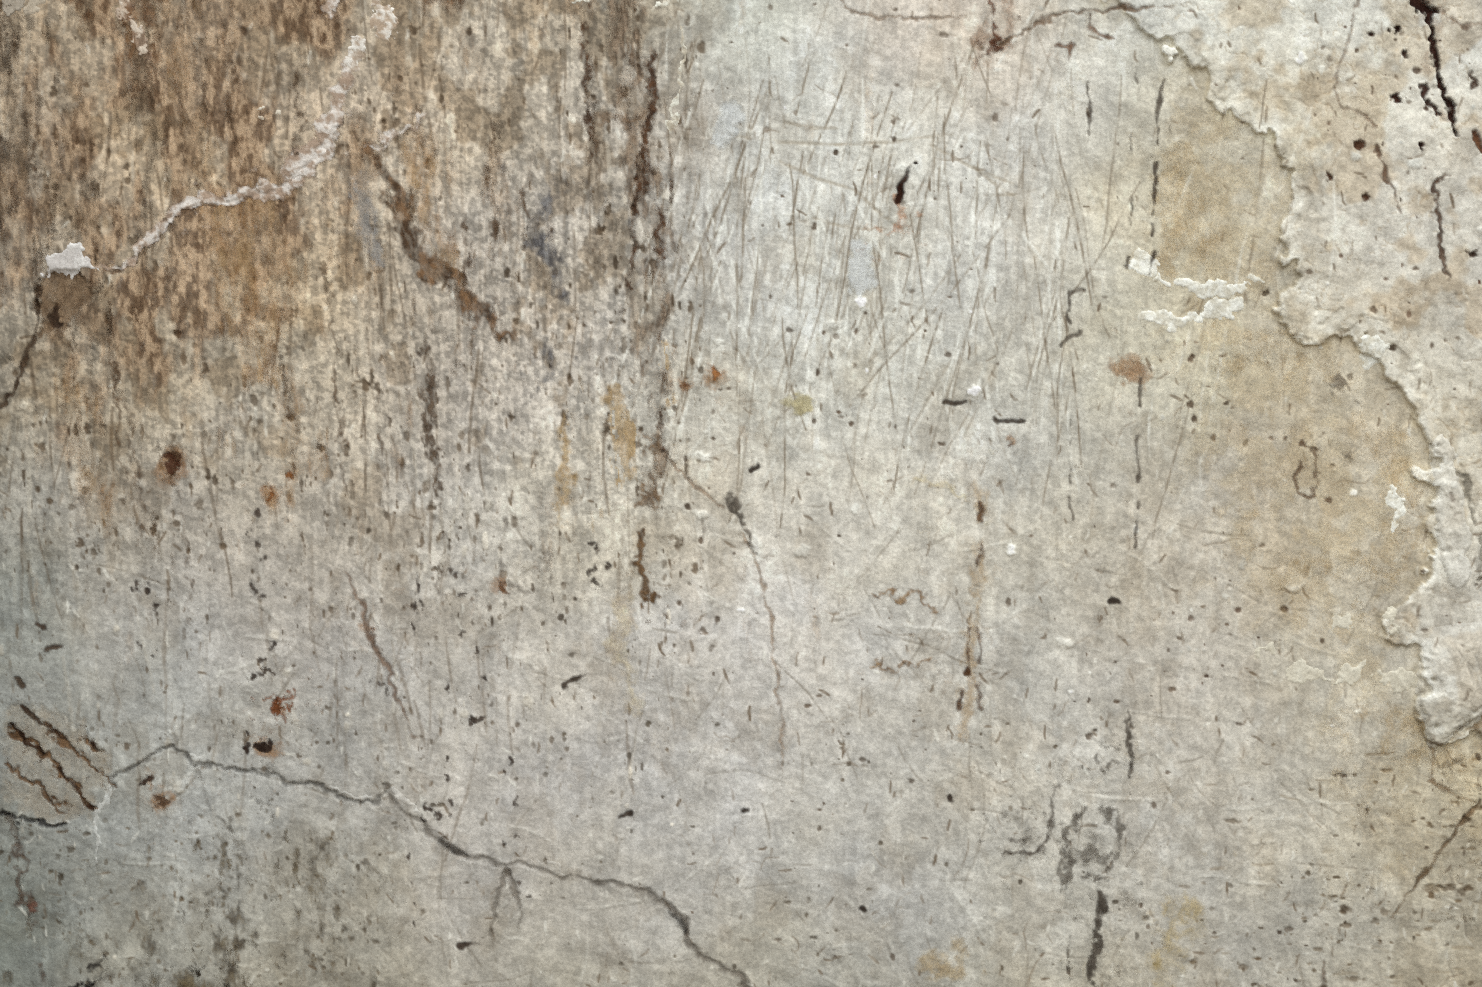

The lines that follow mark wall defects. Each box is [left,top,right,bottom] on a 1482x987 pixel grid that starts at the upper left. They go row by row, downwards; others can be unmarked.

crack [0,286,40,408]
leakage [70,0,303,380]
crack [96,64,425,274]
leakage [348,142,513,341]
leakage [611,2,673,289]
spalling [1125,247,1265,333]
spalling [1358,334,1391,370]
crack [1357,0,1482,276]
leakage [632,528,661,608]
spalling [1384,484,1407,534]
spalling [1254,642,1418,693]
crack [0,811,66,827]